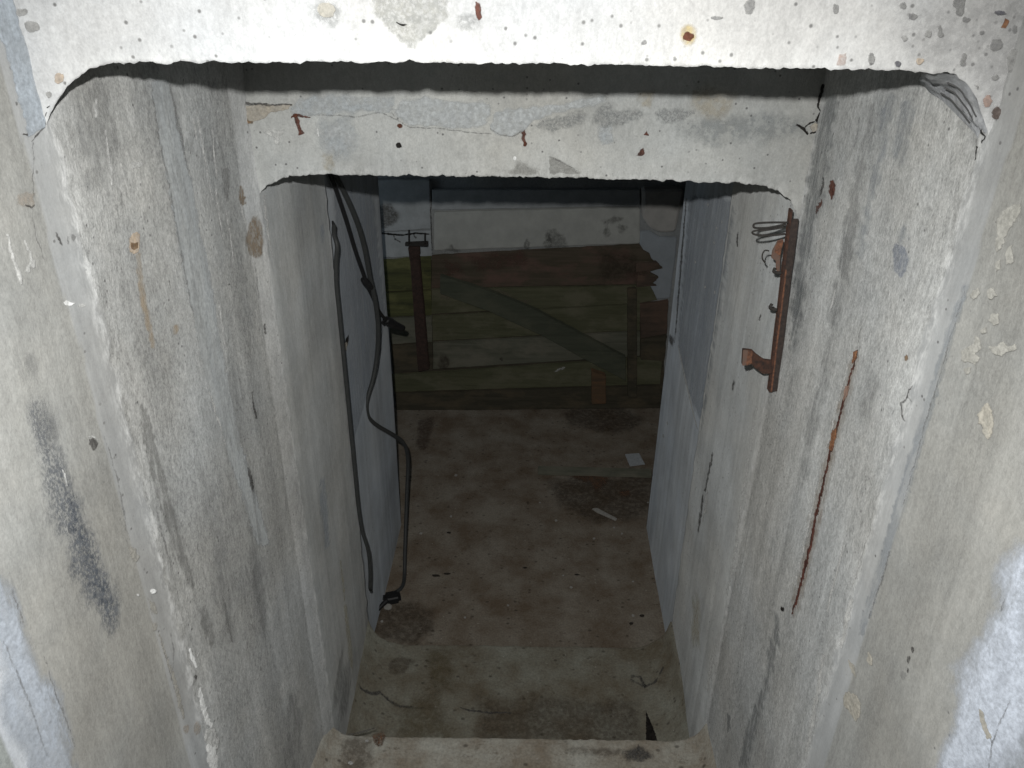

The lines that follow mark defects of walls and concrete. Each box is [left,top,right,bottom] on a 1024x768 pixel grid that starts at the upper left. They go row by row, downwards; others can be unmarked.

corrosion [682,27,695,41]
spalling [953,0,970,22]
spalling [980,31,1018,80]
corrosion [291,113,311,135]
crack [796,84,825,135]
spalling [916,53,1001,138]
peeling [995,204,1021,271]
corrosion [741,208,799,392]
peeling [961,313,1017,374]
peeling [977,403,993,439]
damp [32,411,118,628]